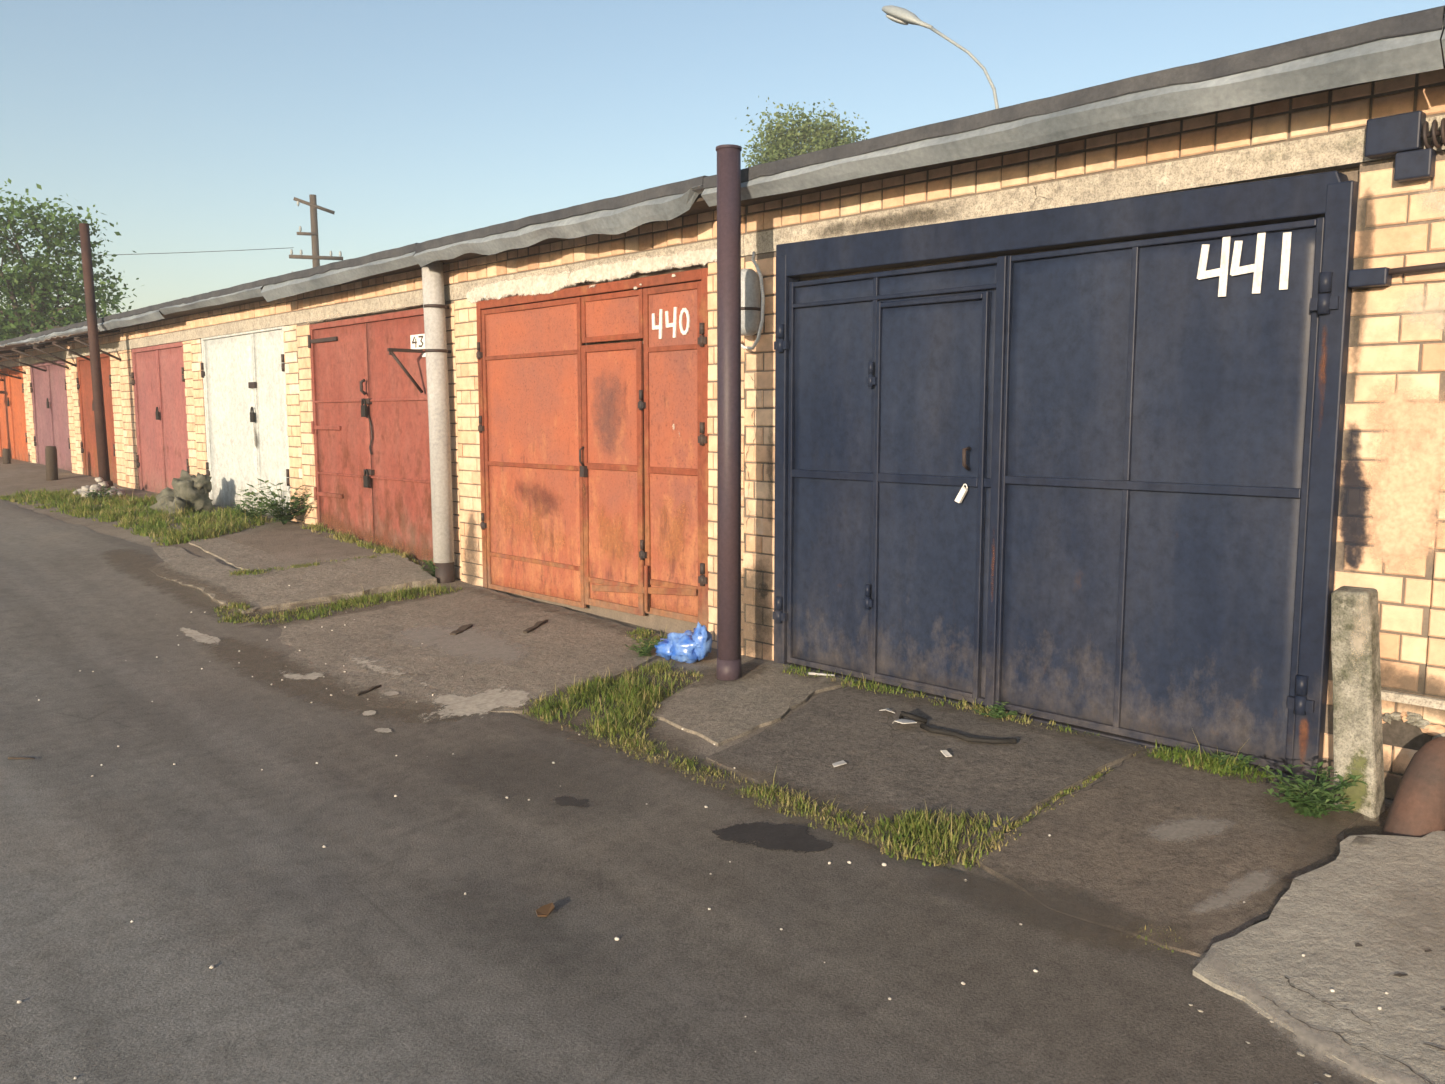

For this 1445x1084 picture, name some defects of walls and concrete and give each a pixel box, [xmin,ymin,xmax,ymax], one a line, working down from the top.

spalling [1382,711,1445,751]
crack [1259,977,1445,1084]